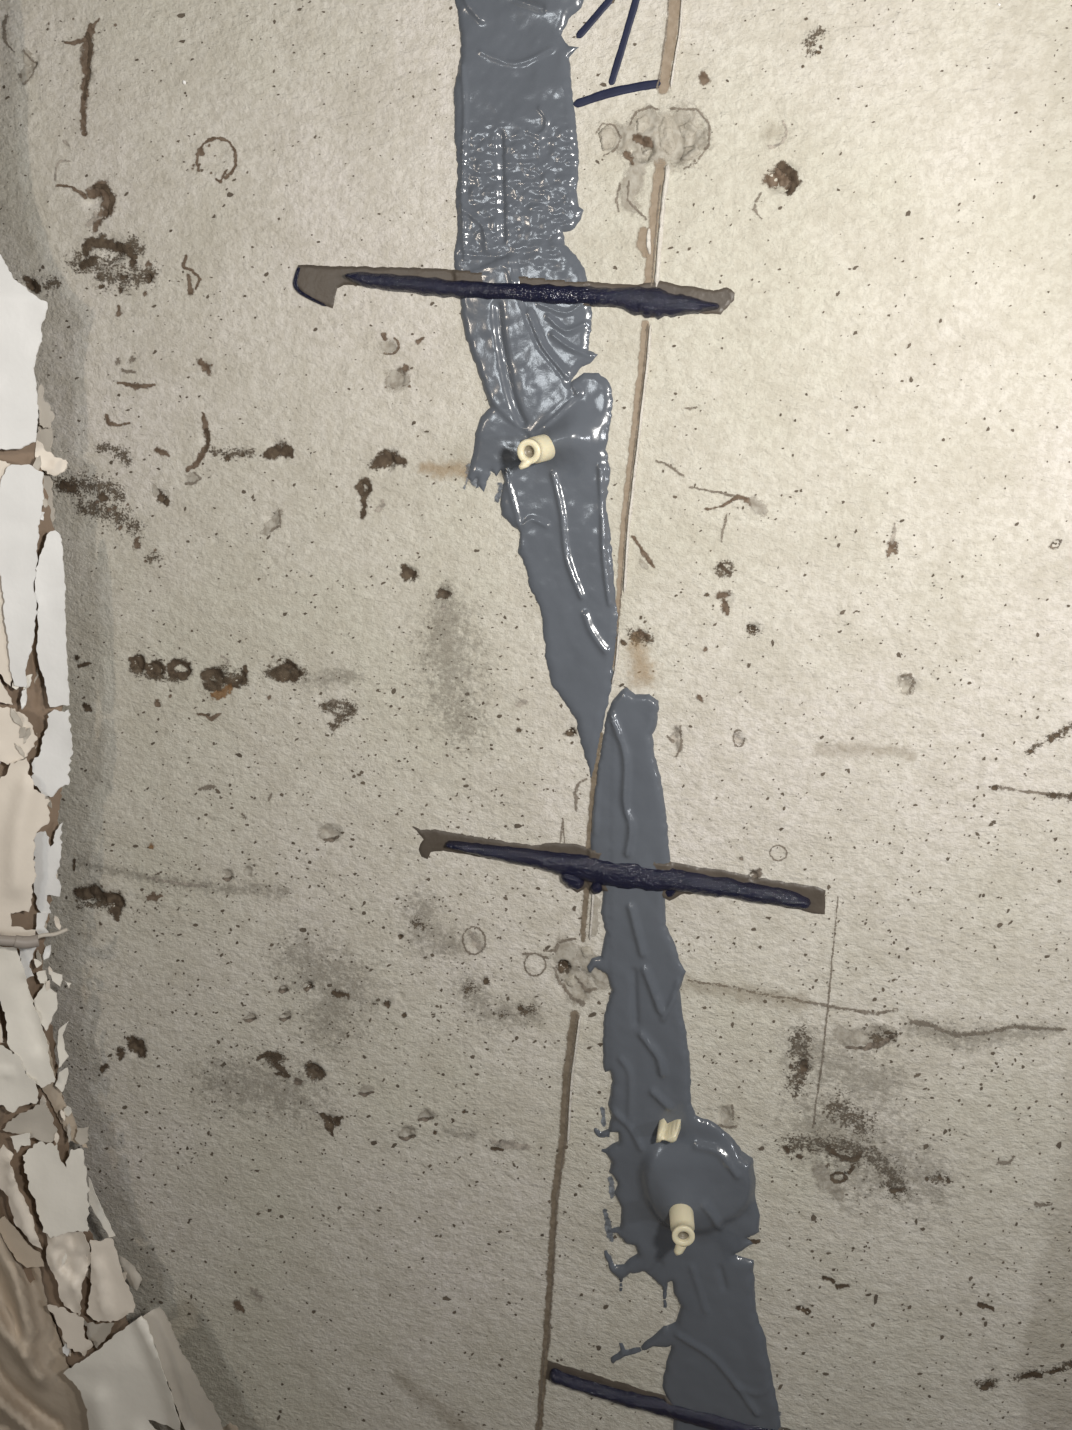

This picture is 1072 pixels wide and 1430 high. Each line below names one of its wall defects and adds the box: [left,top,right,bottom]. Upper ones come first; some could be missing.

peeling [185,472,202,485]
spalling [153,484,170,507]
crack [656,460,768,542]
peeling [260,509,283,536]
crack [992,784,1072,804]
peeling [222,866,252,882]
peeling [278,982,313,994]
crack [688,897,1067,1128]